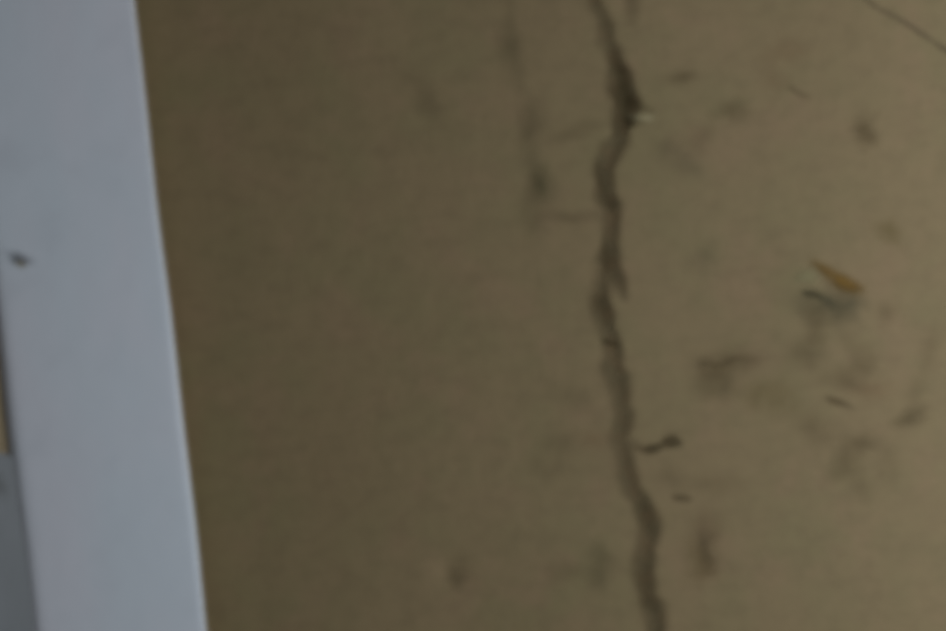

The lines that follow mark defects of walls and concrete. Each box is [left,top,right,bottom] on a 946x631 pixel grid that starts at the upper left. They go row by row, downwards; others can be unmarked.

crack [591,0,681,631]